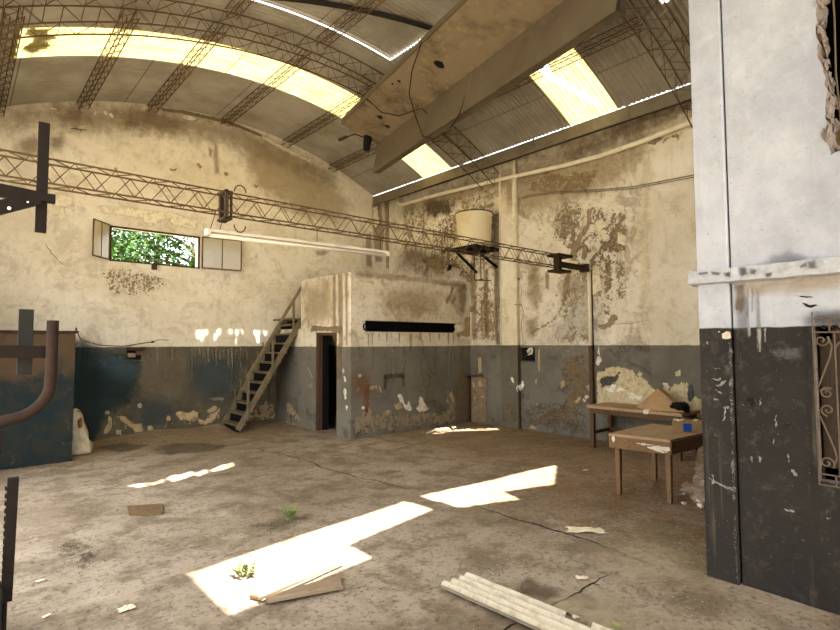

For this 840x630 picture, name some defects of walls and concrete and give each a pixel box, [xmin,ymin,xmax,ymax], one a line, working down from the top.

spalling [816,0,840,154]
peeling [531,205,627,343]
peeling [103,405,220,435]
flaking render [354,357,497,434]
peeling [502,347,702,432]
crack [473,505,664,570]
crack [551,575,608,606]